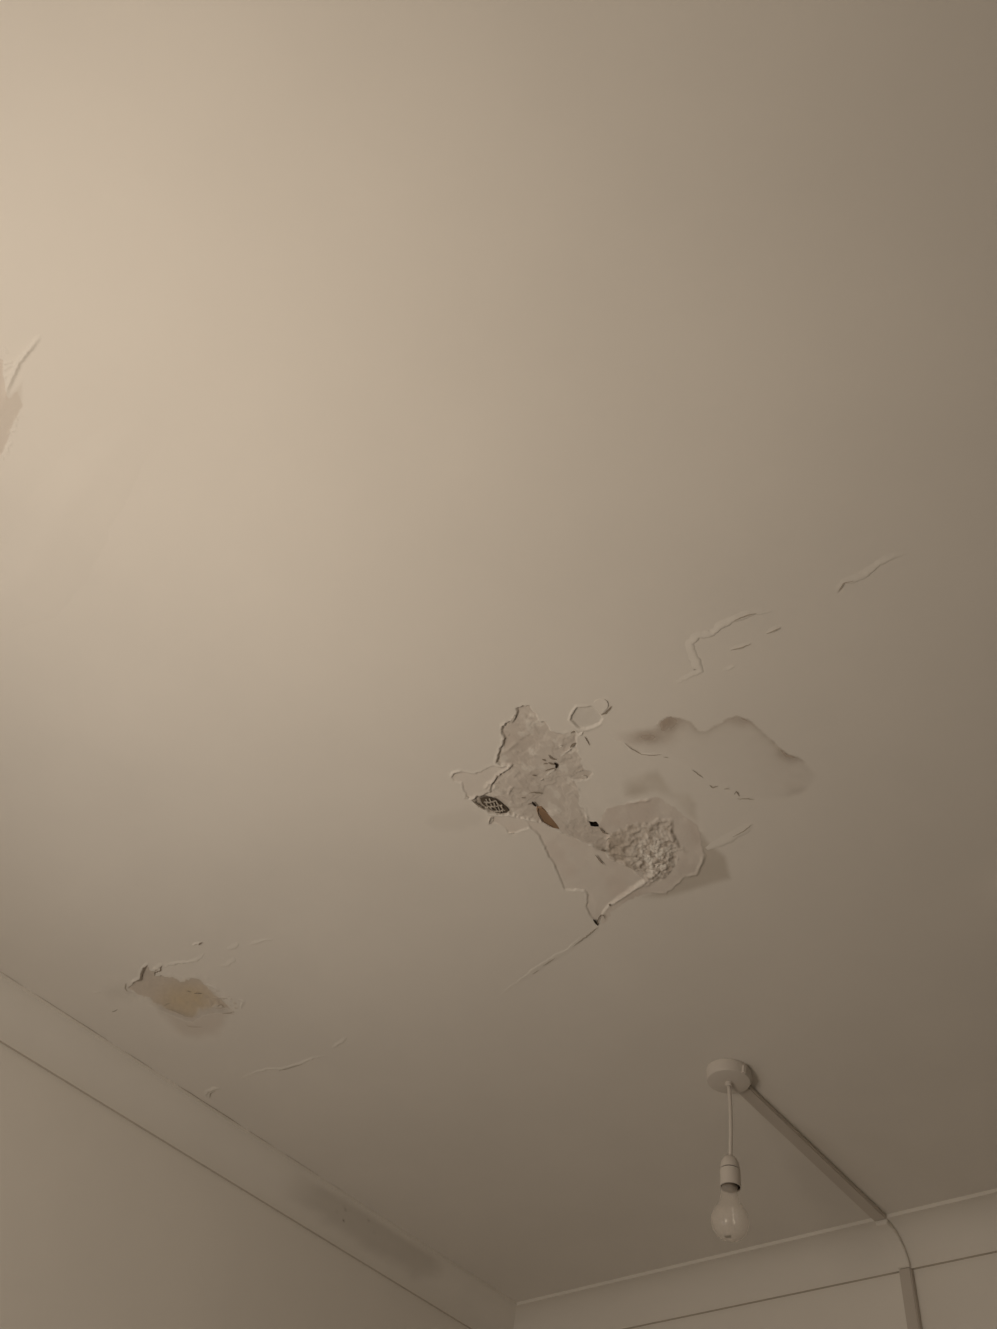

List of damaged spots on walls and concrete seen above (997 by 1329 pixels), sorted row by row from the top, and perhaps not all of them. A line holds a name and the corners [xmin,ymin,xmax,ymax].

peeling [0,333,45,462]
crack [676,608,781,684]
peeling [447,699,735,930]
peeling [123,938,274,1027]